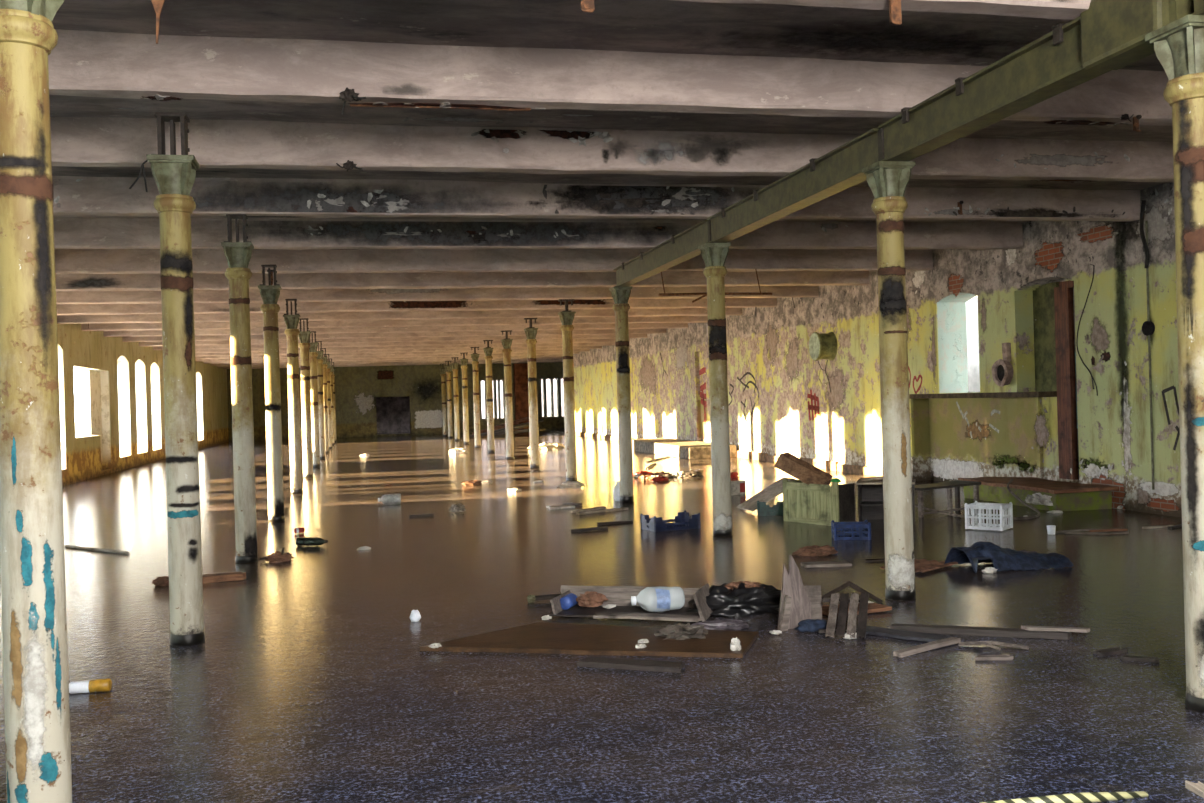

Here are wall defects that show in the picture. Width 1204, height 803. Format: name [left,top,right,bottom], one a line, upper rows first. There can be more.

peeling [980,207,1083,217]
spalling [1005,210,1125,272]
peeling [1136,189,1174,248]
spalling [946,273,964,296]
leakage [1115,235,1129,418]
leakage [1184,363,1199,551]
peeling [10,510,62,713]
leakage [1195,618,1204,656]
peeling [7,729,59,803]